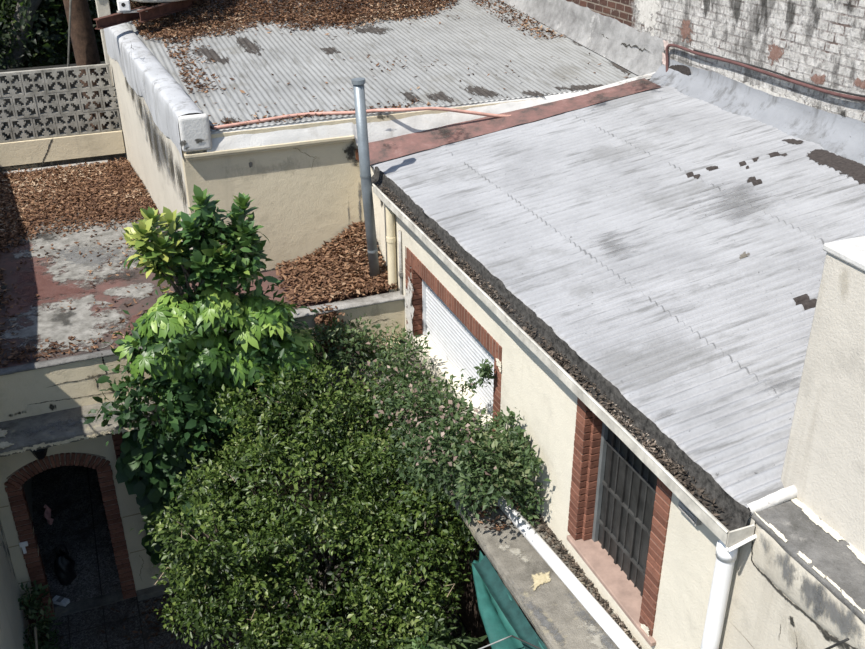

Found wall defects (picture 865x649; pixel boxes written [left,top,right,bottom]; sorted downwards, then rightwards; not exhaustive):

damp [729,0,741,22]
damp [786,0,795,30]
damp [669,65,691,76]
damp [125,77,185,211]
peeling [12,266,95,308]
crack [29,353,136,405]
peeling [755,512,787,543]
peeling [791,498,865,564]
peeling [531,571,551,591]
crack [751,541,854,649]
damp [779,554,860,649]
peeling [797,551,865,614]